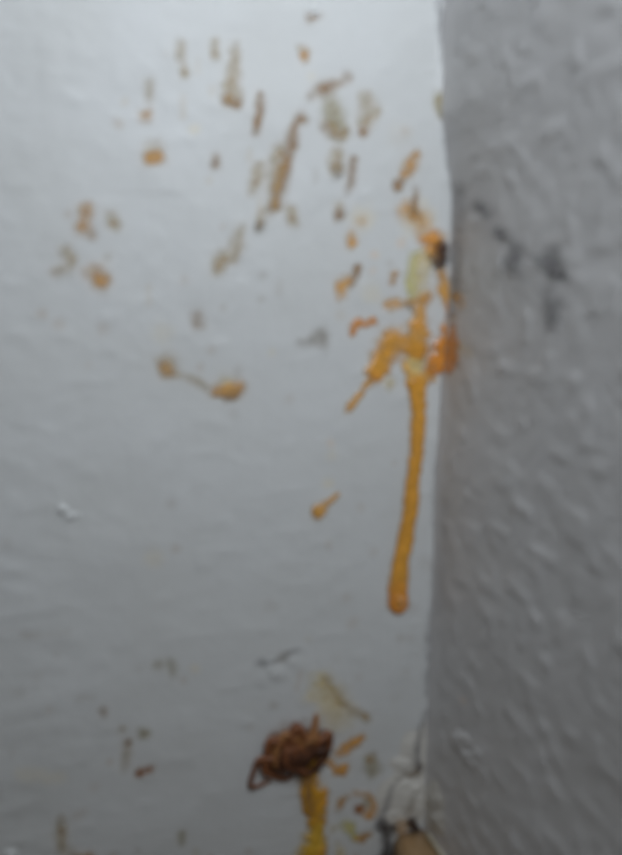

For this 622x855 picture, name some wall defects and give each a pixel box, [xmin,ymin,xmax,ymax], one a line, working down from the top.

crack [405,749,423,777]